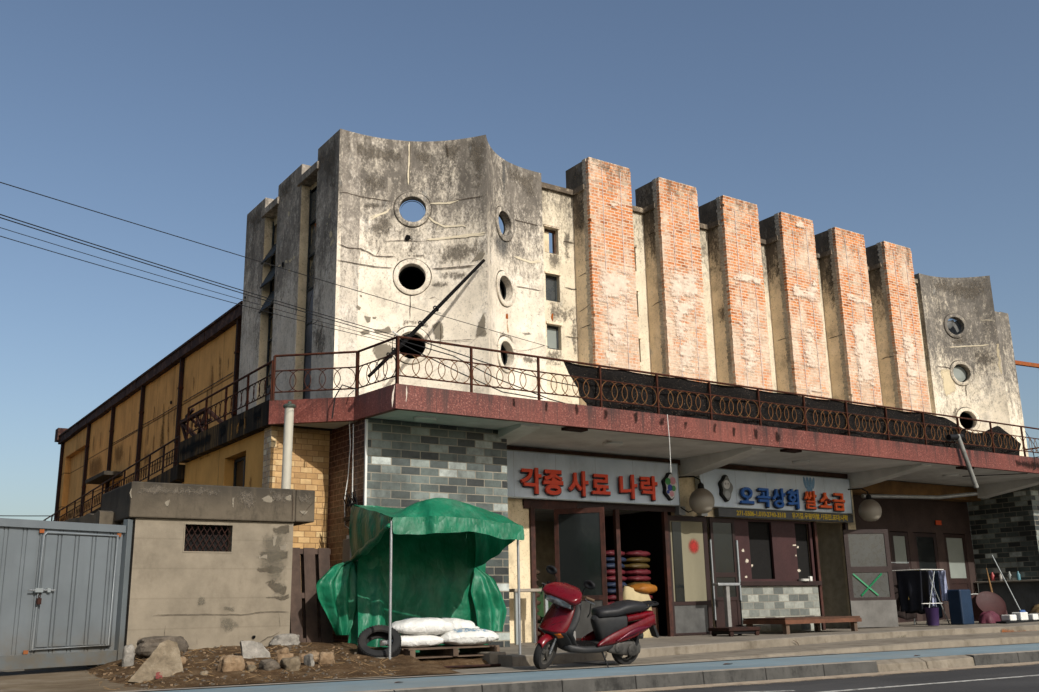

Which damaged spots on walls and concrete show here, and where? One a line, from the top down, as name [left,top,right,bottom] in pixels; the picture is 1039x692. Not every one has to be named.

damp [349,144,401,161]
damp [365,203,391,235]
damp [430,242,481,299]
peeling [600,269,630,364]
peeling [670,266,700,373]
peeling [734,274,761,284]
peeling [740,309,758,372]
peeling [792,279,818,300]
peeling [803,328,817,367]
peeling [851,321,875,385]
peeling [902,335,919,385]
peeling [257,525,289,600]